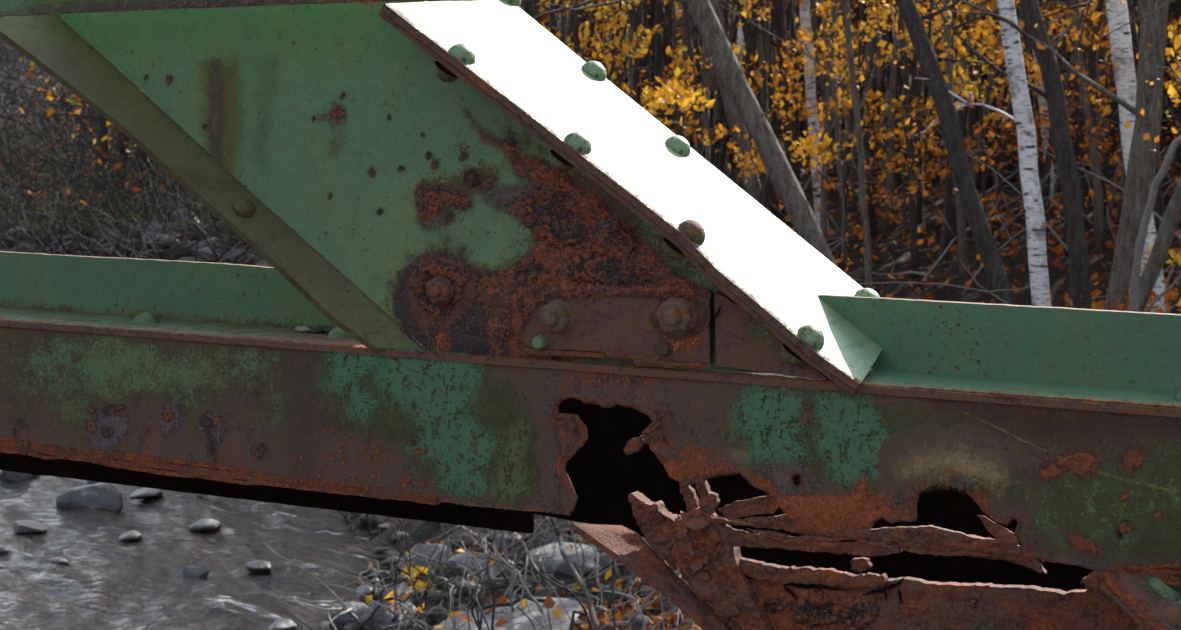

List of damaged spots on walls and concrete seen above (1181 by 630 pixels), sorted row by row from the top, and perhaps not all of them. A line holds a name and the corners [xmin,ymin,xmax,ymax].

corrosion [389,108,708,361]
corrosion [85,404,136,451]
peeling [623,435,645,455]
corrosion [762,448,817,498]
peeling [714,383,974,498]
corrosion [1032,442,1146,488]
peeling [717,495,779,518]
corrosion [628,475,1048,630]
corrosion [1060,522,1139,625]